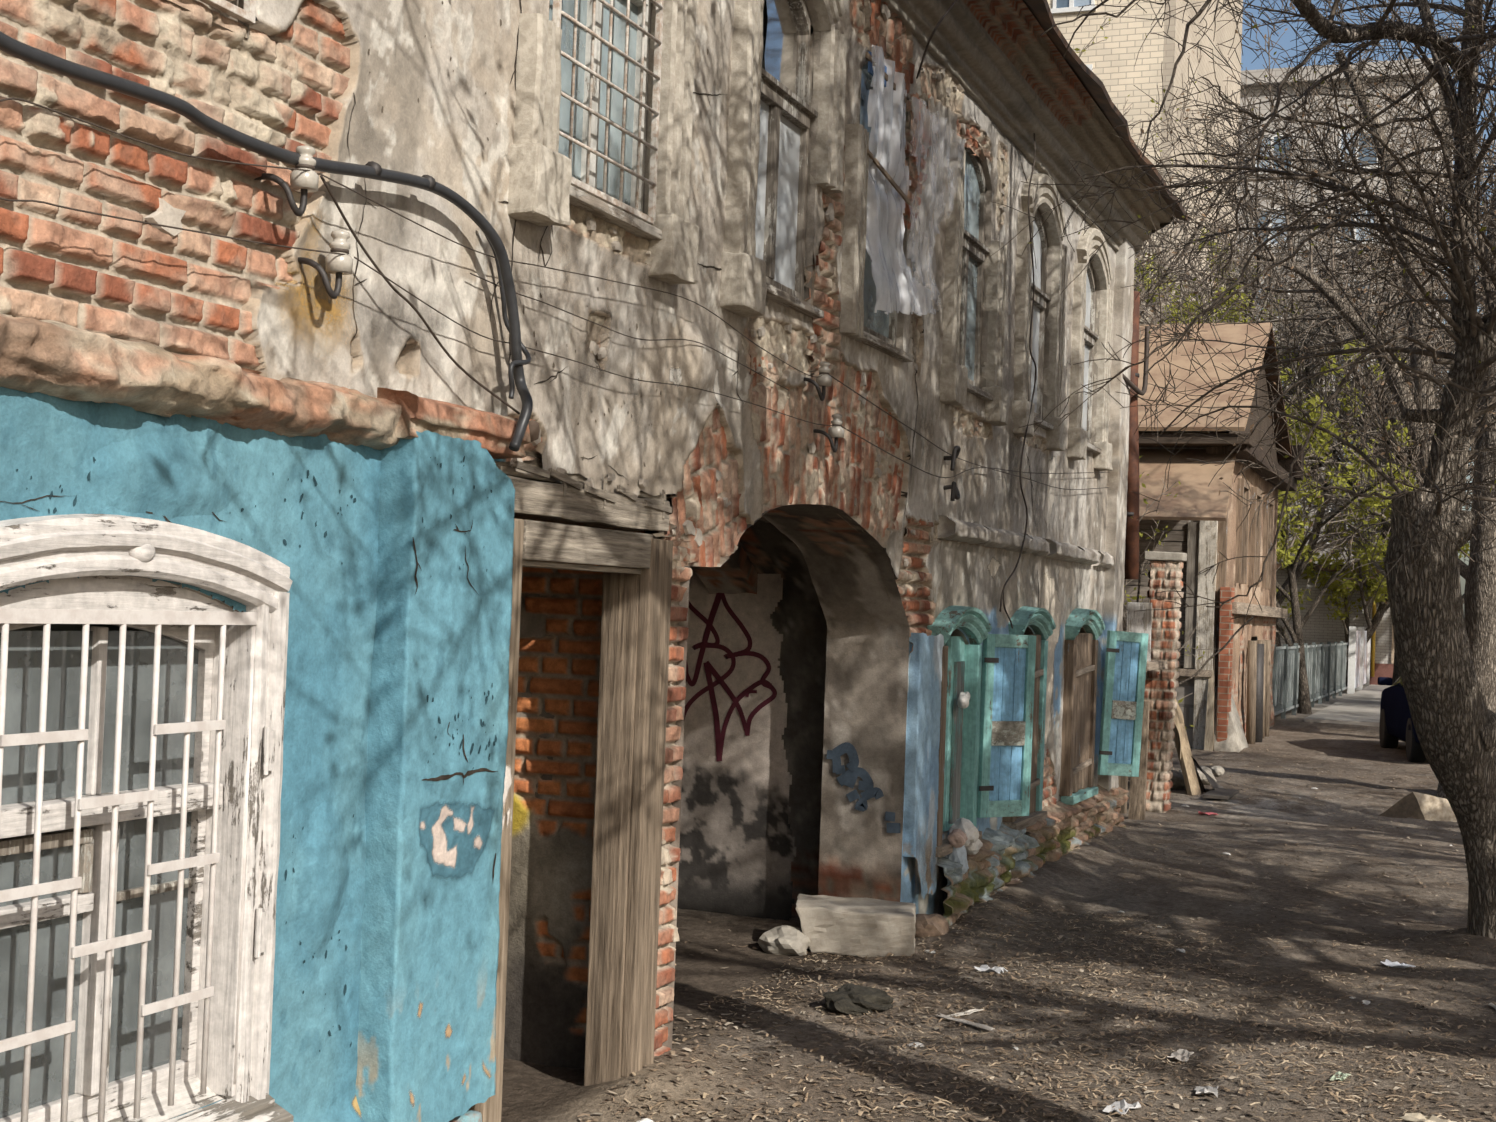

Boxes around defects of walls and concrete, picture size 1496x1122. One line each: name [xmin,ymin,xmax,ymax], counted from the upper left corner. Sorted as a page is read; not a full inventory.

flaking render [0,0,350,376]
flaking render [850,0,1008,231]
flaking render [506,173,937,1056]
peeling [419,802,494,879]
crack [422,722,497,785]